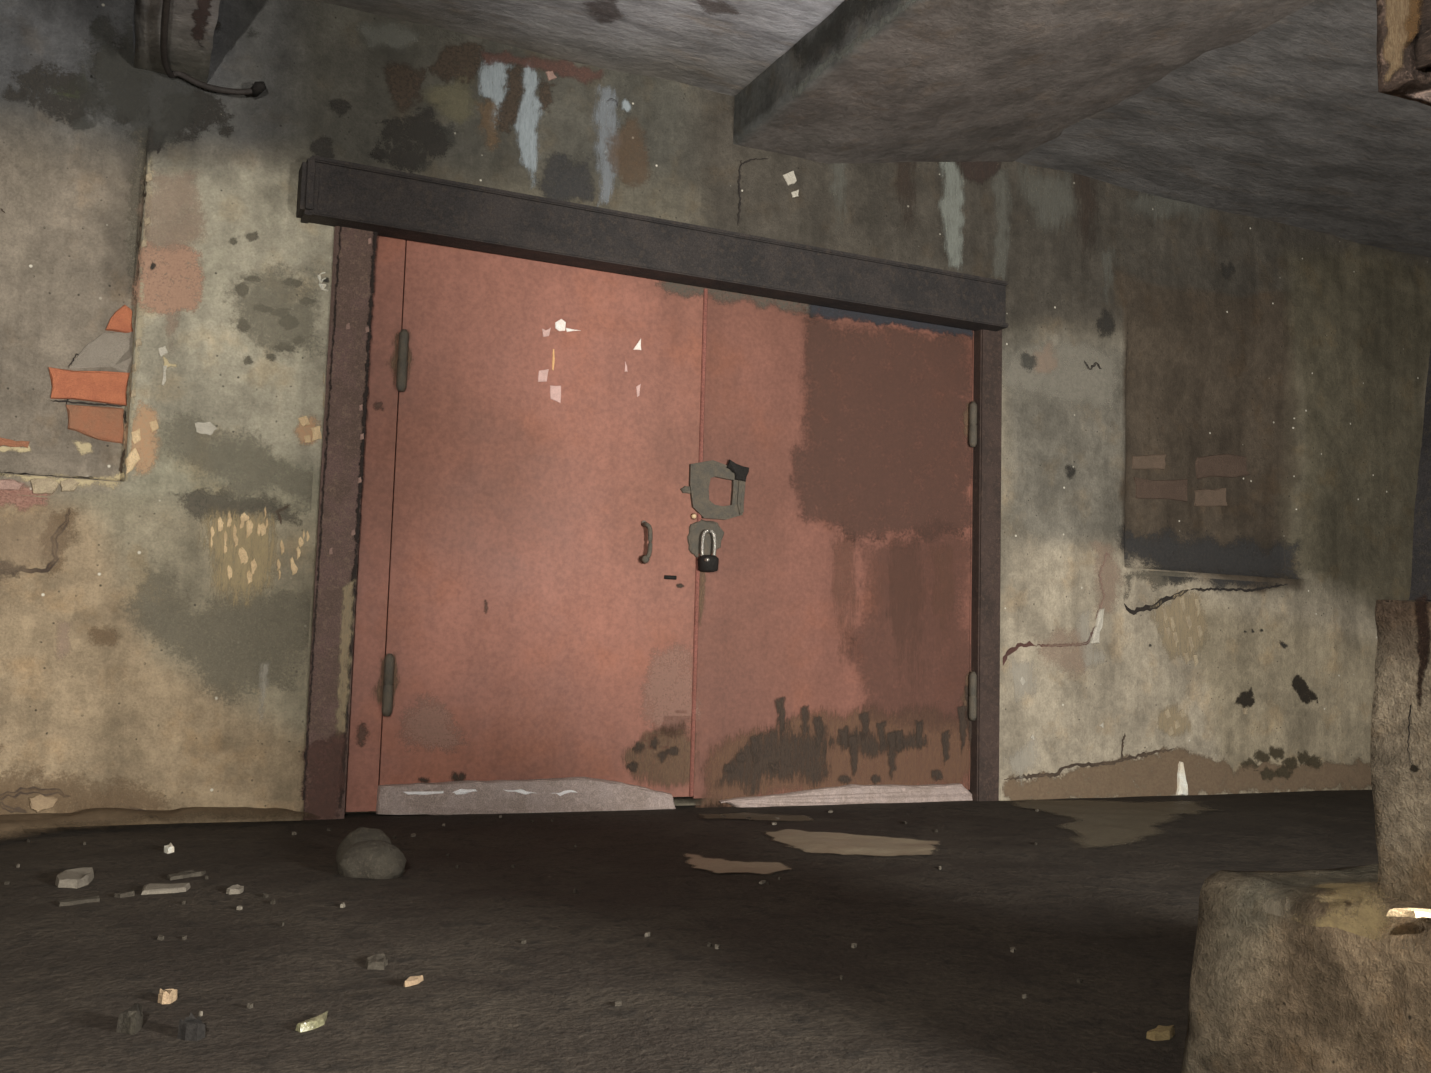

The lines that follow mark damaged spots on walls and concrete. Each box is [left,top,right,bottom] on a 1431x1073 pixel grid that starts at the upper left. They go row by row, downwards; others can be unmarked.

damp [3,0,234,153]
damp [357,24,650,203]
flaking render [48,129,159,481]
crack [0,508,76,577]
rust [621,686,972,808]
crack [1003,552,1112,665]
crack [1407,594,1430,772]